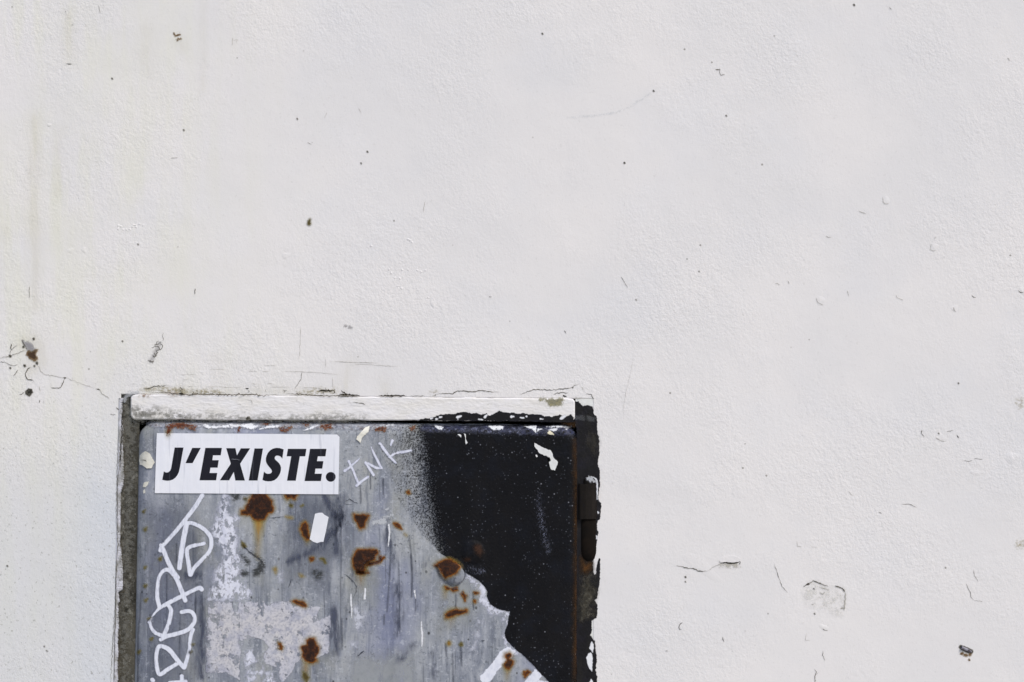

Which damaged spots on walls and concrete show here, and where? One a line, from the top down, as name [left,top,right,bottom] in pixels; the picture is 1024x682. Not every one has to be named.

crack [522,385,593,399]
crack [1,341,146,677]
rust [240,494,310,541]
rust [353,513,370,530]
rust [352,548,386,575]
rust [434,545,483,619]
crack [680,555,741,572]
rust [300,637,320,682]